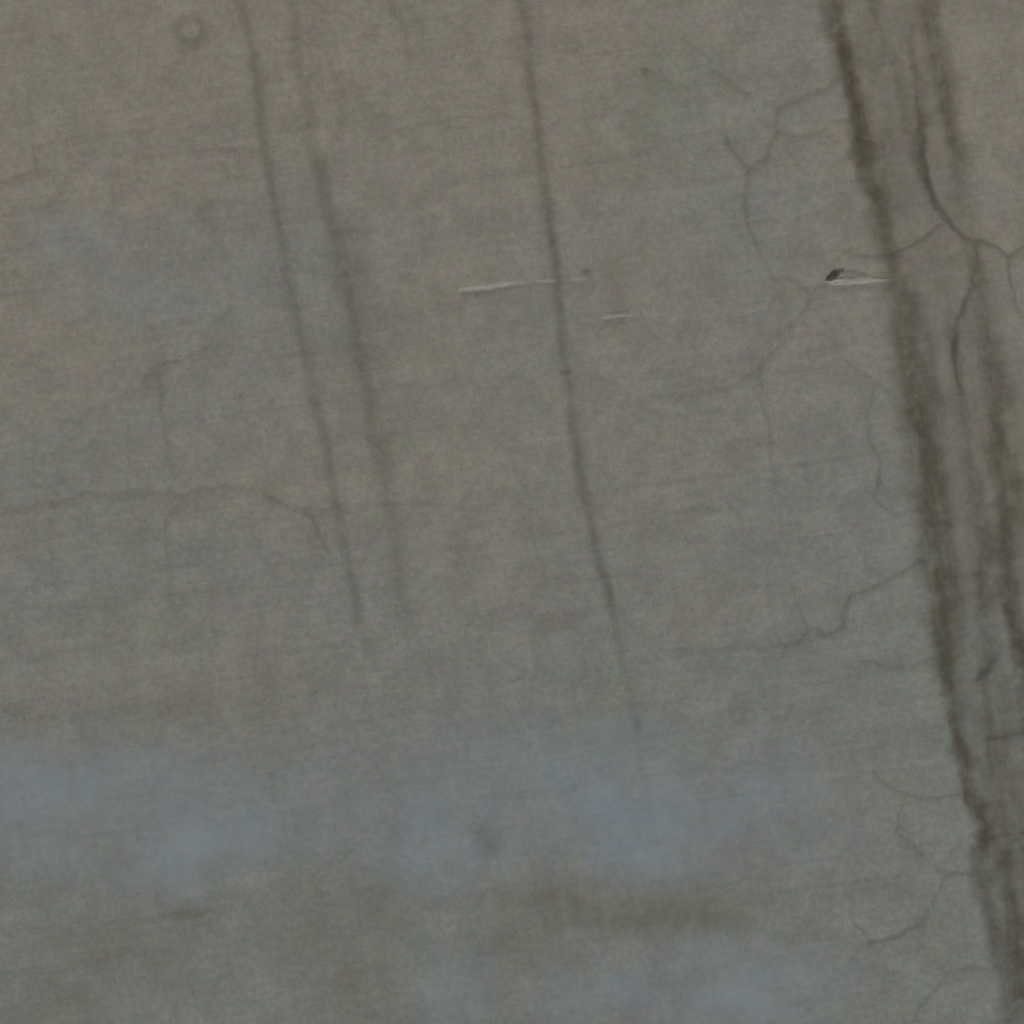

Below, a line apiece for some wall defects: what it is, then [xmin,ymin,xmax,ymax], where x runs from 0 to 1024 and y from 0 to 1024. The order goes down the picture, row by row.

spalling [806,236,906,308]